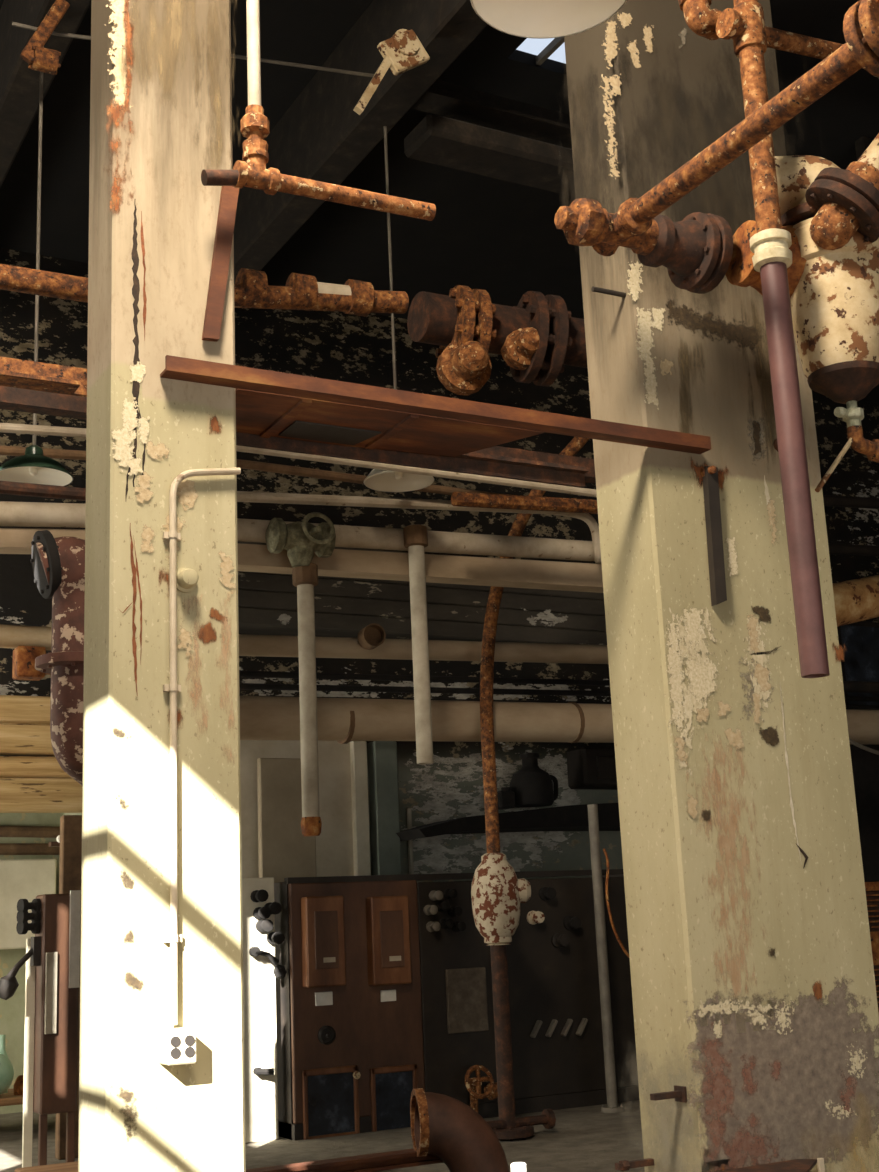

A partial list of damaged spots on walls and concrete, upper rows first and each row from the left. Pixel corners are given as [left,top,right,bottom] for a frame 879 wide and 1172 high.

spalling [106,0,135,212]
peeling [602,12,654,96]
peeling [626,261,759,410]
peeling [109,361,169,505]
peeling [725,537,738,577]
rust [195,608,228,668]
peeling [665,606,779,776]
peeling [686,794,711,821]
peeling [684,978,879,1172]